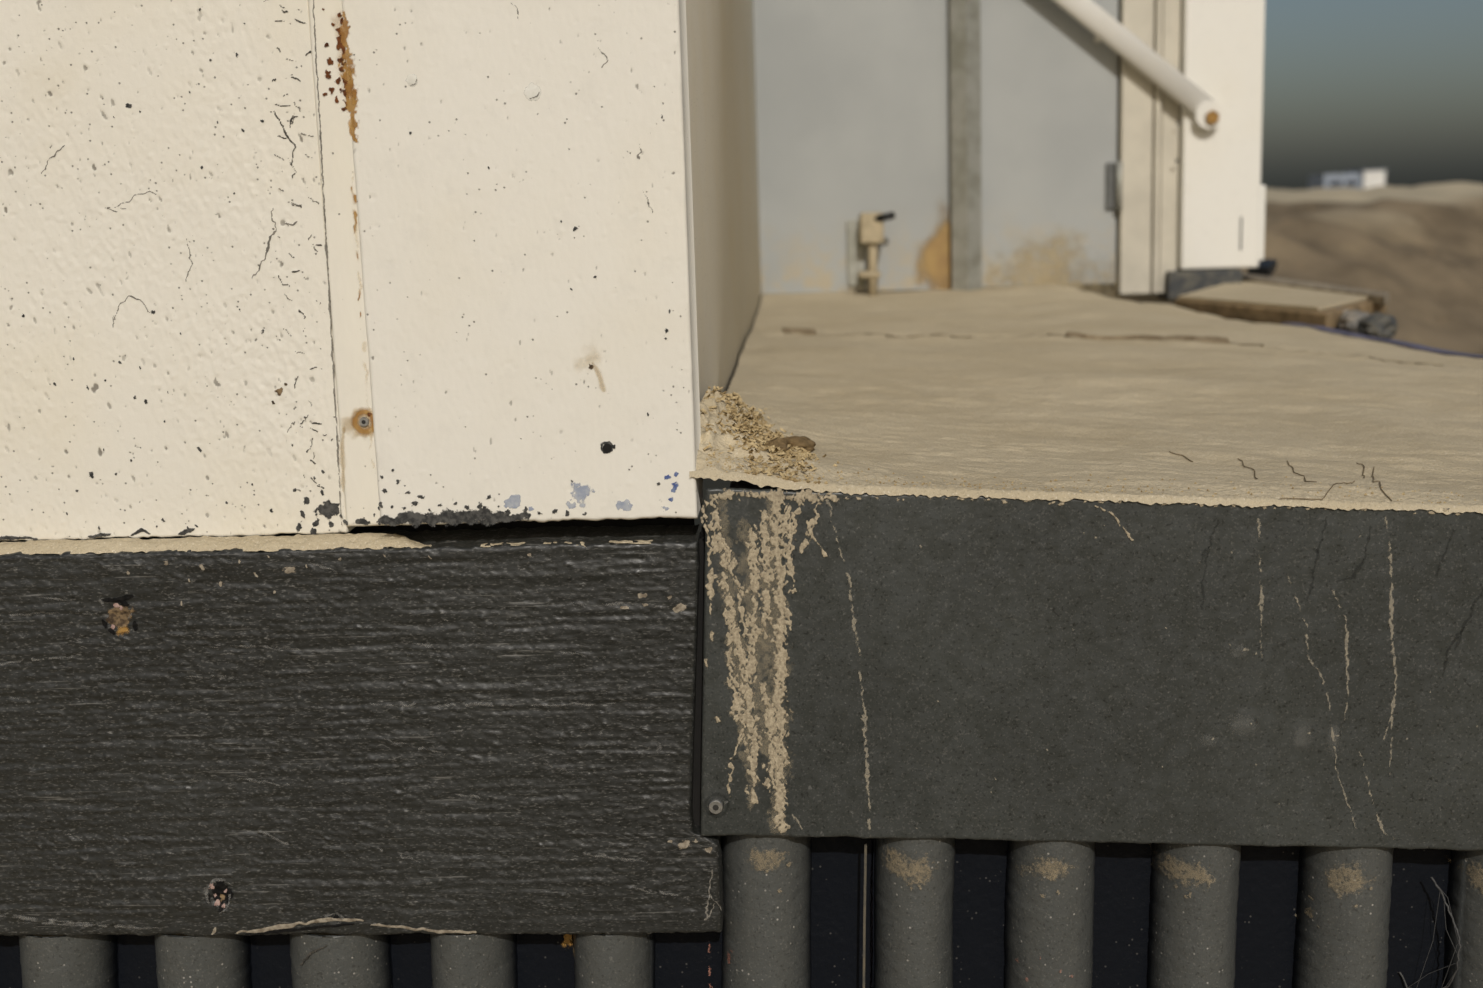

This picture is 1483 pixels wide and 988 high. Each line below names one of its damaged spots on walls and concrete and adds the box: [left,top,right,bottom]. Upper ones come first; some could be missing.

corrosion [323,12,358,142]
crack [1257,517,1398,832]